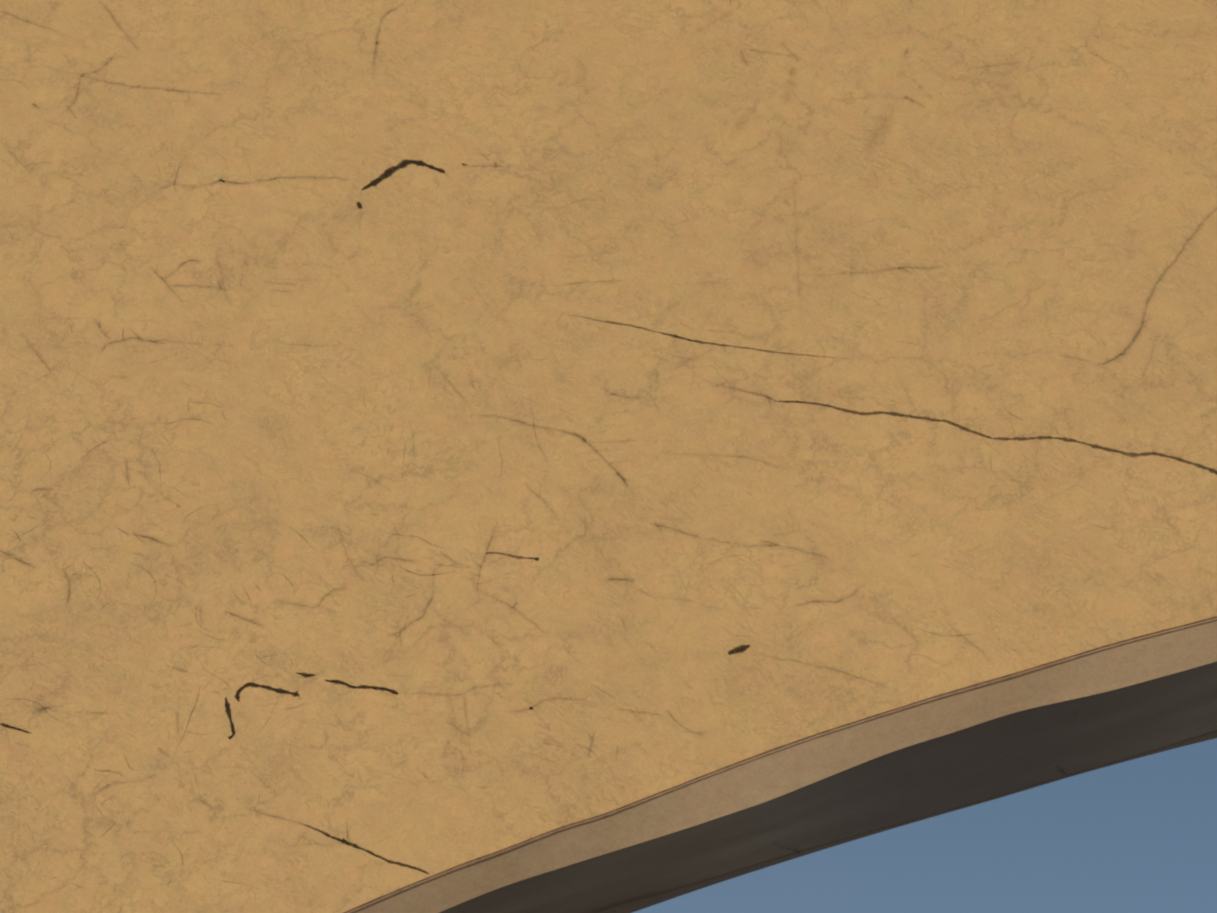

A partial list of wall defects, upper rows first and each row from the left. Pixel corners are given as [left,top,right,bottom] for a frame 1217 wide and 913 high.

crack [356,160,466,209]
crack [631,325,737,347]
crack [779,400,1217,474]
crack [225,672,398,740]
crack [306,616,1217,913]